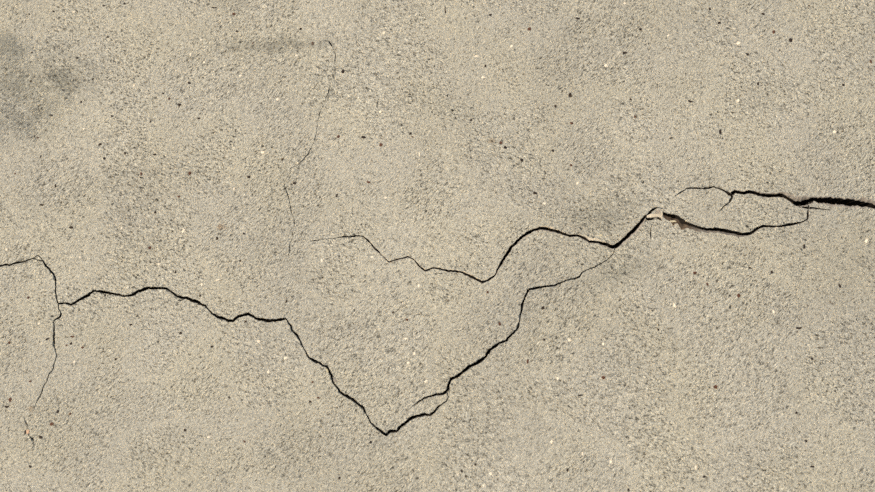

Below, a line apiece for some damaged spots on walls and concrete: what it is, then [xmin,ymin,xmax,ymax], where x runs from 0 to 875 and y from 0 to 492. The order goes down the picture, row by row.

crack [0,83,875,447]